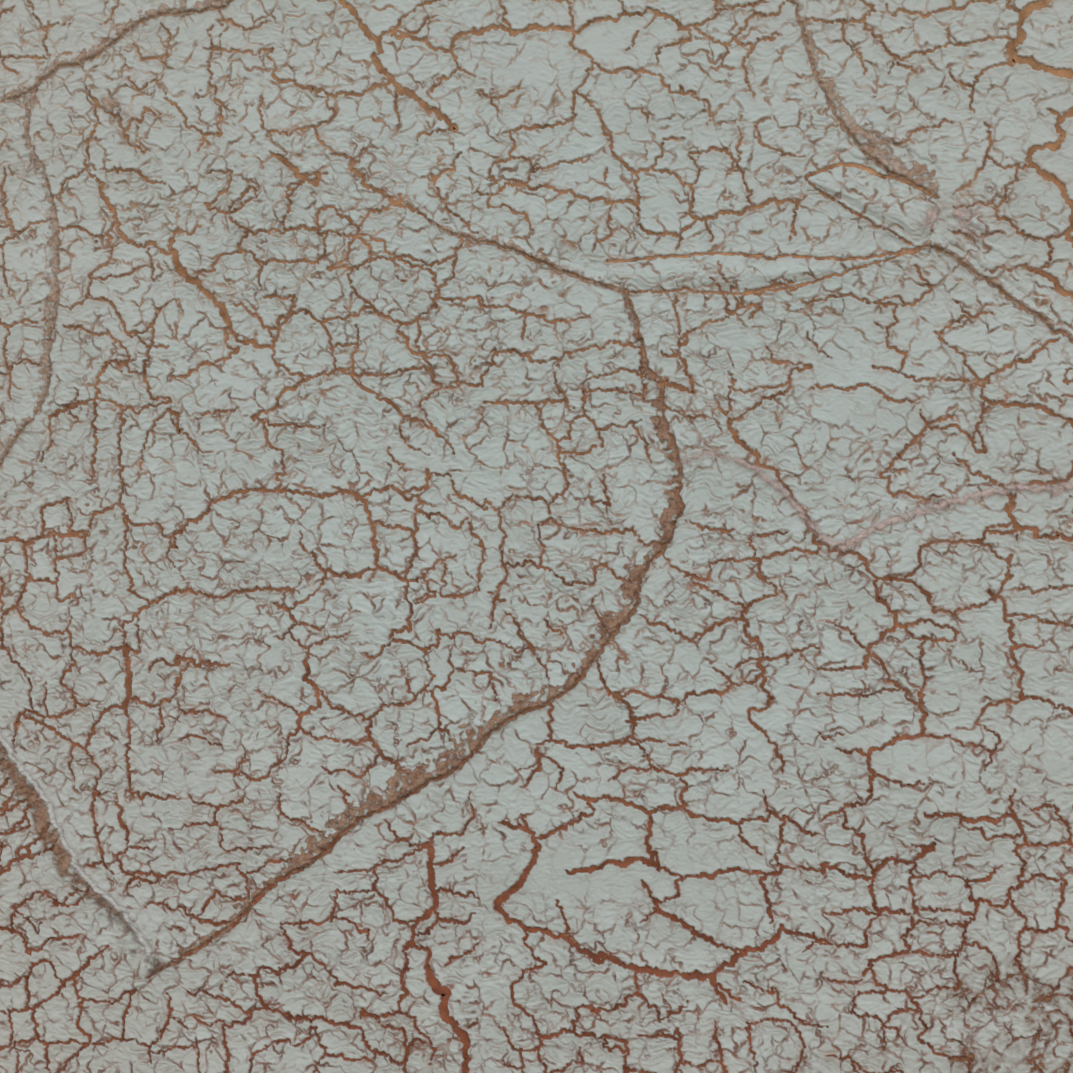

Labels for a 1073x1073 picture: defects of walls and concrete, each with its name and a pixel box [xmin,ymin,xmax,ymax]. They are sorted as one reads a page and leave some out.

crack [0,0,247,468]
crack [165,0,1073,249]
crack [0,297,295,800]
crack [108,153,1073,1073]
crack [0,764,58,875]
crack [86,766,114,874]
crack [0,888,201,1073]